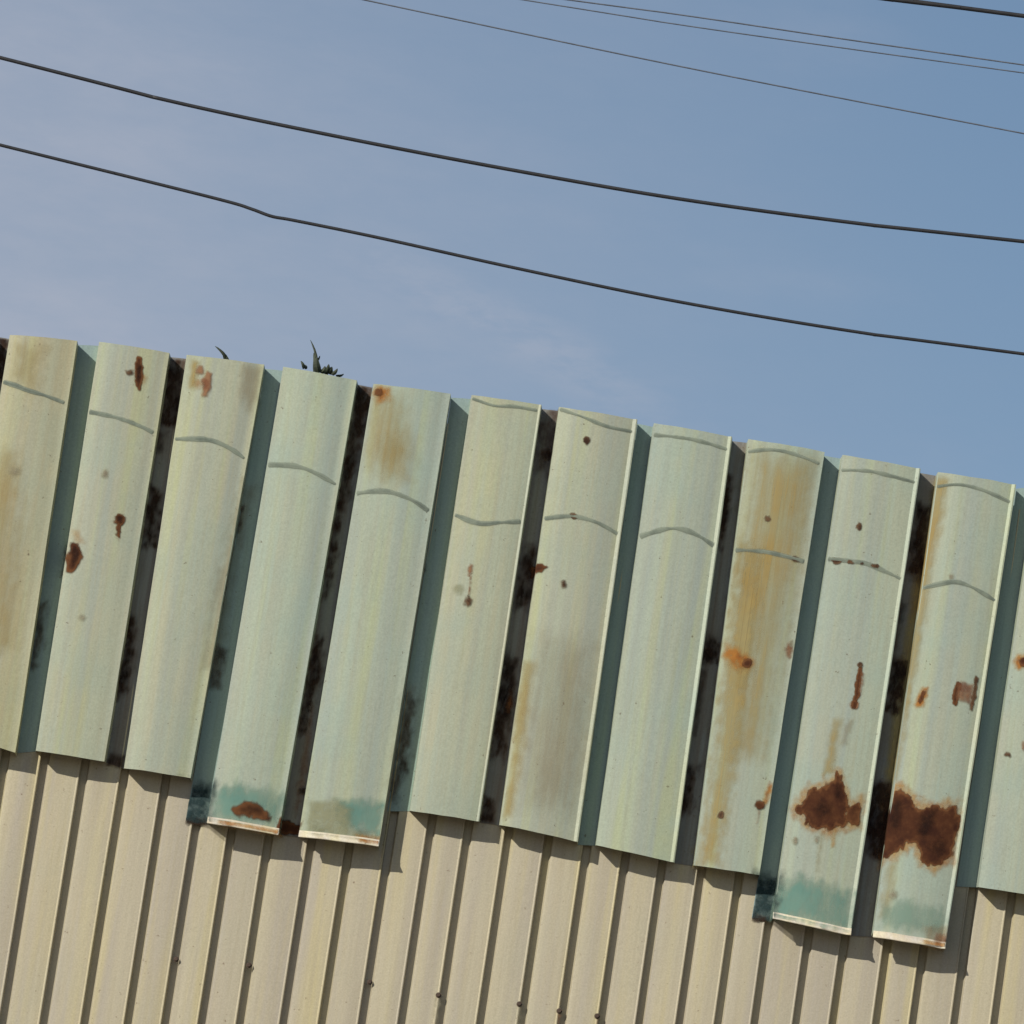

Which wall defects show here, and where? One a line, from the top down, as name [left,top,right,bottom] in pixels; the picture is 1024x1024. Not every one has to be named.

corrosion [126,356,143,391]
corrosion [158,360,212,449]
corrosion [324,387,389,597]
corrosion [718,474,731,545]
corrosion [65,542,83,573]
corrosion [850,662,863,709]
corrosion [952,676,978,711]
water stain [214,786,285,821]
corrosion [224,801,301,837]
water stain [310,801,384,837]
corrosion [795,731,961,871]
water stain [774,877,848,926]